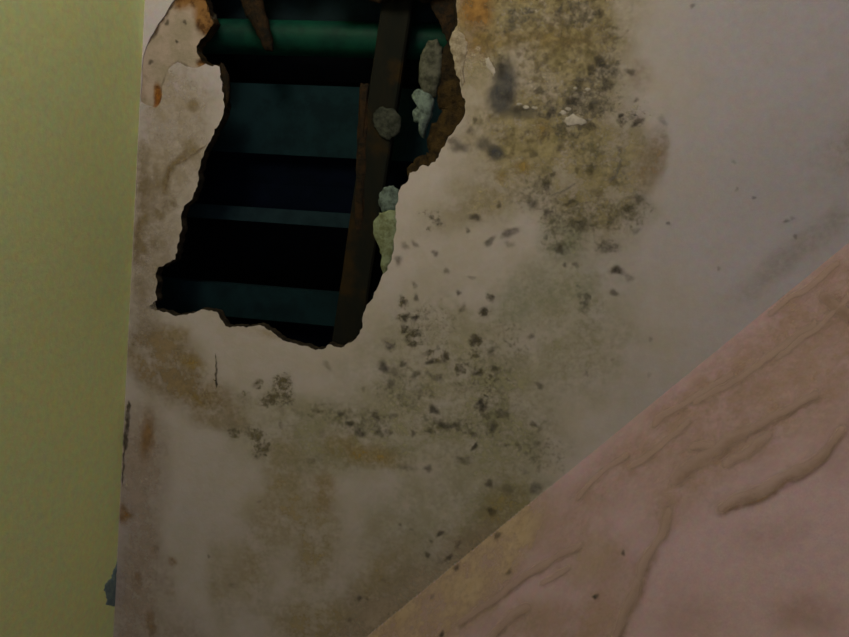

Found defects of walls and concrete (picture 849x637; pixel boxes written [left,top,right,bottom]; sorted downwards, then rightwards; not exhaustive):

peeling [141,0,216,108]
flaking render [449,29,468,85]
damp [456,0,662,231]
damp [131,71,222,405]
damp [261,375,291,407]
damp [290,334,542,637]